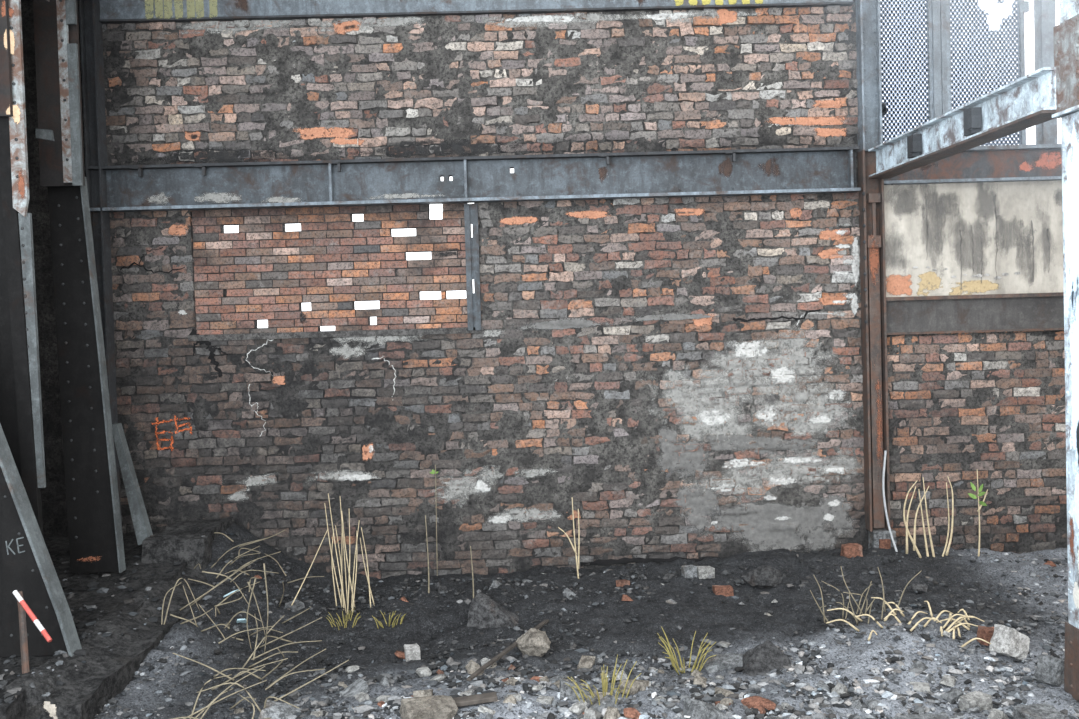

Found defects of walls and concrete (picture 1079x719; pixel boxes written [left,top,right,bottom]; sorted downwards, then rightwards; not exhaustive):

leakage [654,330,861,501]
corrosion [867,241,879,280]
leakage [891,182,1051,290]
peeling [1020,114,1079,569]